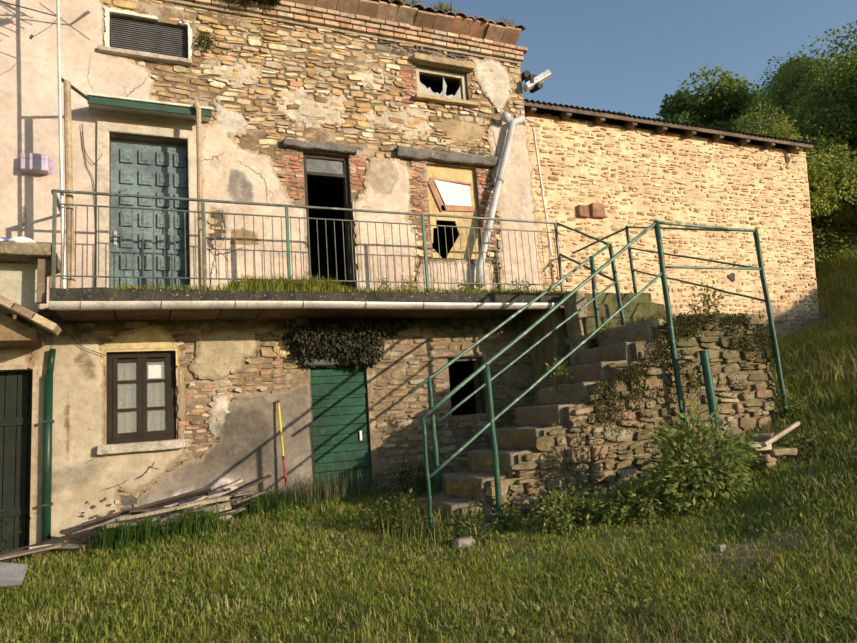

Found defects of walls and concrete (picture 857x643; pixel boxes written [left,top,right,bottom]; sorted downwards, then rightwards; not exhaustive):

crack [204,151,271,193]
spalling [207,211,225,248]
flaking render [98,323,295,455]
crack [99,462,158,492]